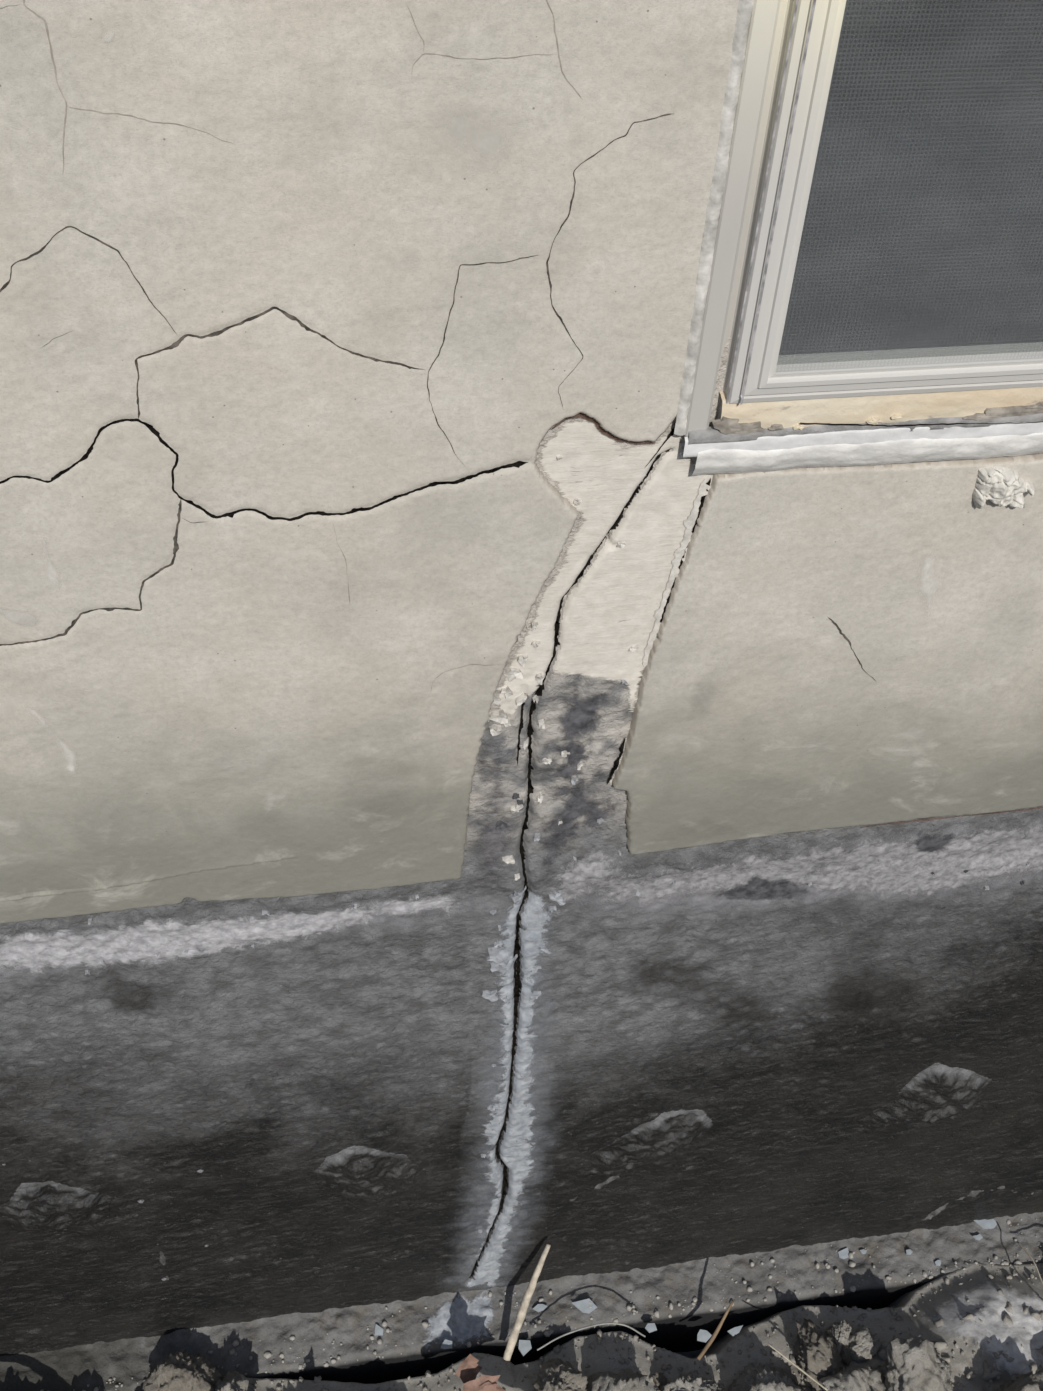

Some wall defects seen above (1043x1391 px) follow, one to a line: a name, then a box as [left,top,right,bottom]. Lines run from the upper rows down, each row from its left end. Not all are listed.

crack [2,0,234,170]
crack [408,0,583,100]
crack [0,114,670,646]
spalling [481,419,713,882]
crack [643,478,712,667]
crack [828,617,875,680]
damp [0,894,461,977]
crack [469,427,675,1278]
damp [424,820,1043,1348]